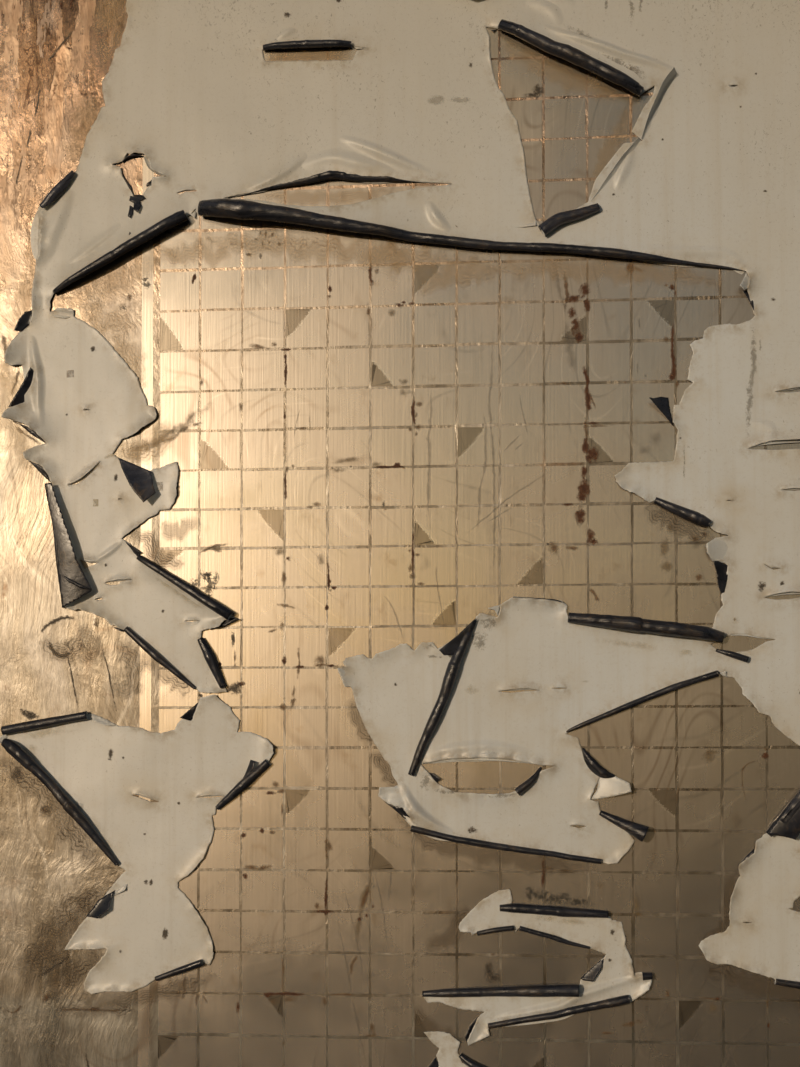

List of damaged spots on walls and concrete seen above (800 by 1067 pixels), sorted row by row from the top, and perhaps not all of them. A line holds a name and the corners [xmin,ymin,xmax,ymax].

peeling [488,19,644,97]
peeling [53,67,754,310]
corrosion [564,278,590,343]
peeling [29,461,92,608]
peeling [118,458,156,503]
corrosion [564,369,601,545]
peeling [513,554,770,663]
peeling [0,541,274,994]
peeling [408,599,542,796]
peeling [384,801,602,864]
peeling [582,748,649,842]
peeling [415,889,653,1067]